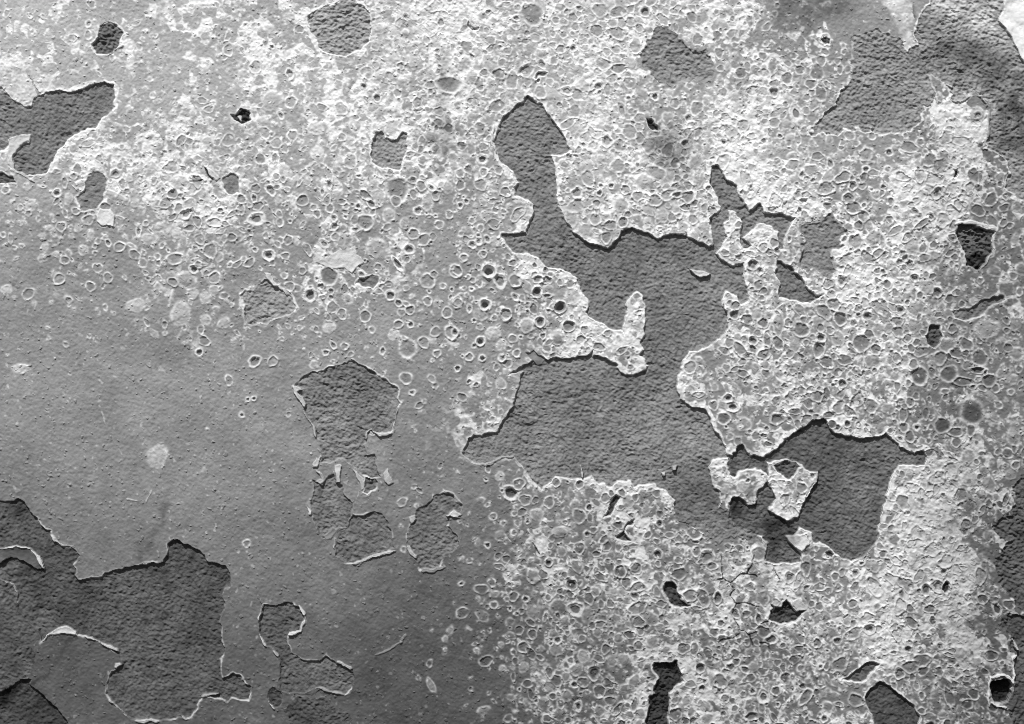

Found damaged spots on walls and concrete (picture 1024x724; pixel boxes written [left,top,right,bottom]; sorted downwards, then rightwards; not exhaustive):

spalling [92,22,124,56]
peeling [308,0,372,57]
peeling [640,26,715,86]
peeling [809,0,1024,201]
peeling [0,83,115,184]
peeling [371,132,408,171]
spalling [955,220,998,272]
peeling [463,96,927,565]
peeling [293,359,463,573]
peeling [0,499,251,724]
spalling [645,660,684,724]
peeling [844,662,921,724]